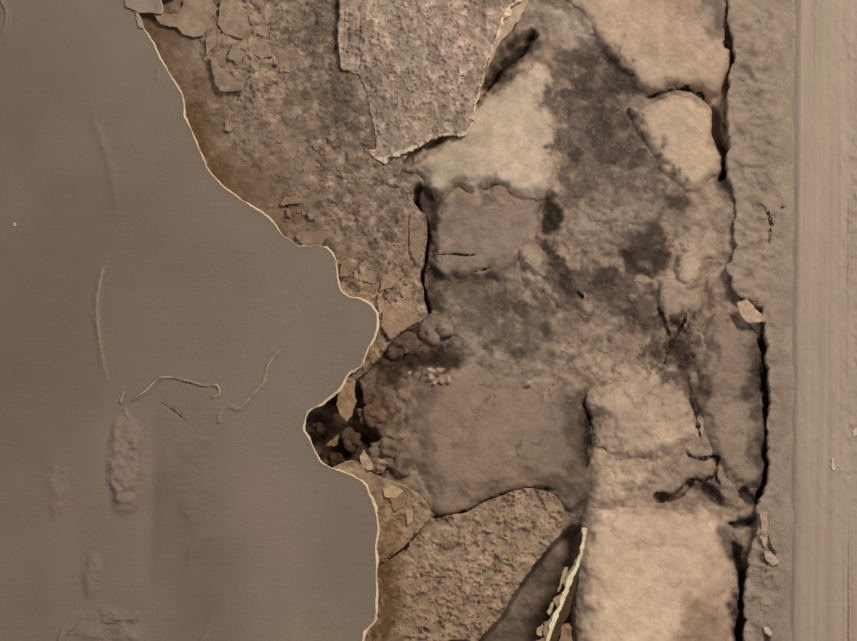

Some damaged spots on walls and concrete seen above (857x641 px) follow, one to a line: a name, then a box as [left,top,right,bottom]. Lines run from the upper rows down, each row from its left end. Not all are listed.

leakage [417,31,712,411]
spalling [125,0,564,641]
leakage [376,346,461,385]
crack [658,308,687,365]
spalling [724,0,779,641]
crack [654,379,722,503]
leakage [658,478,722,505]
peeling [559,623,573,641]